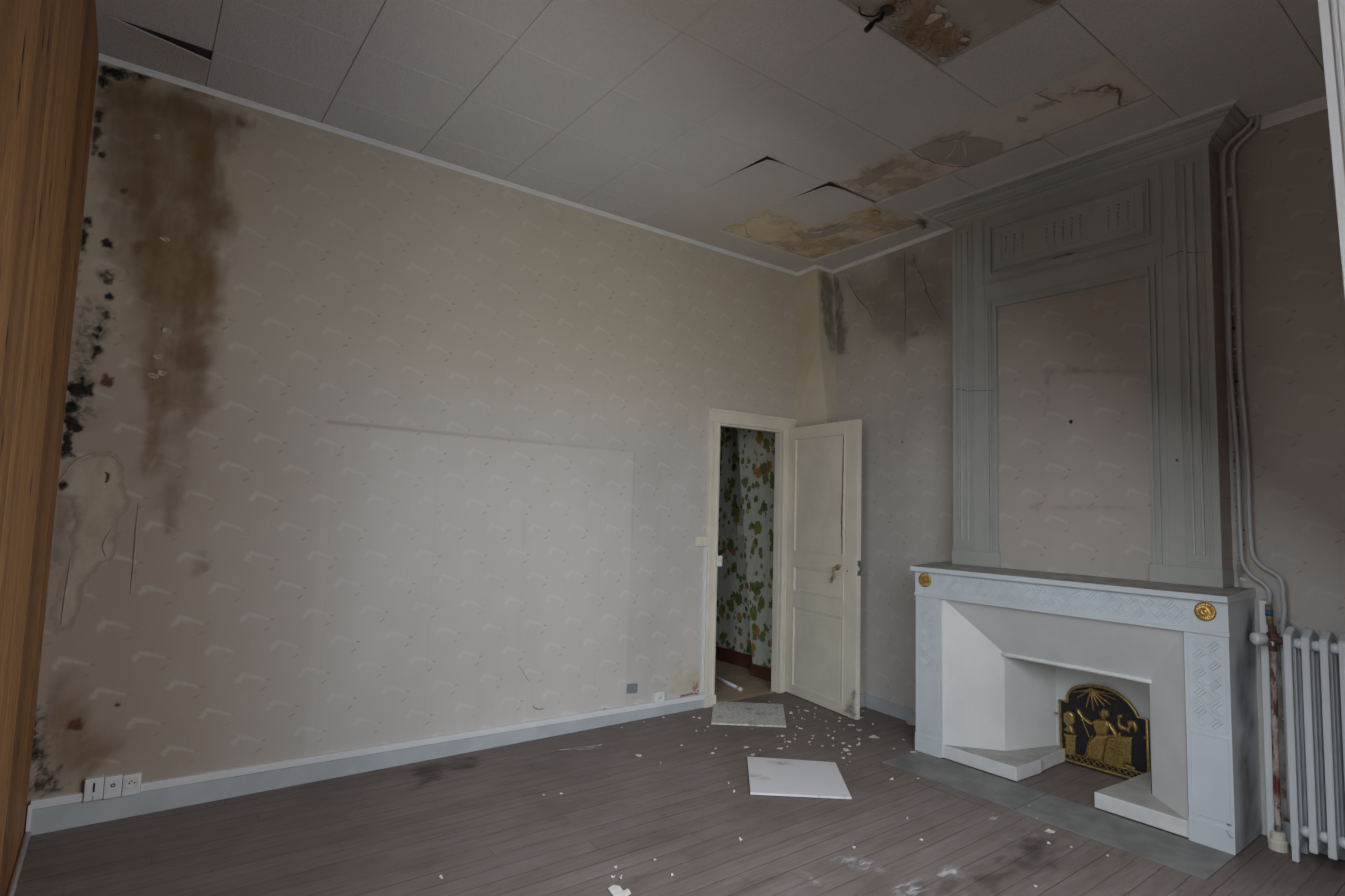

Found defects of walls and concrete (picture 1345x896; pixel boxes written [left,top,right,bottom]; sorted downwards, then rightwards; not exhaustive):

peeling [849,0,1056,62]
mould [99,66,149,88]
mould [93,110,106,159]
mould [81,218,112,250]
peeling [723,205,915,259]
mould [92,270,114,358]
mould [61,374,113,457]